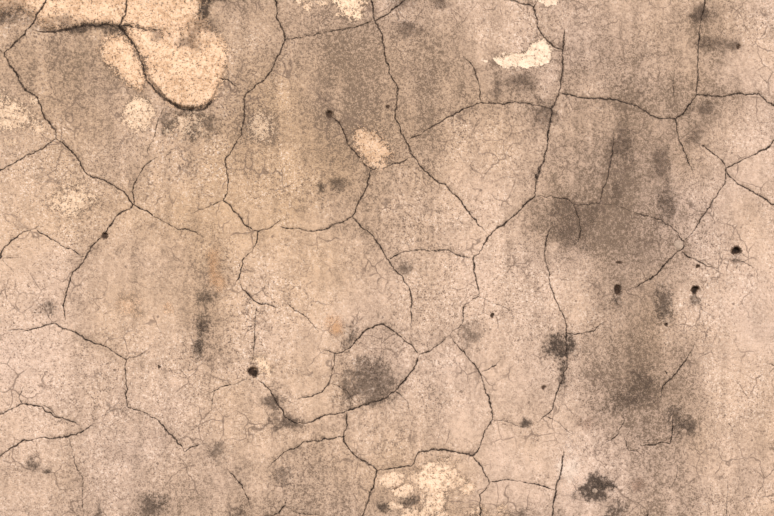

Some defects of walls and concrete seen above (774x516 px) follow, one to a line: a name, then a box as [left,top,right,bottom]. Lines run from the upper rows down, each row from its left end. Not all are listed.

peeling [0,0,208,132]
peeling [481,36,553,69]
peeling [163,104,208,142]
peeling [353,127,392,169]
crack [0,0,213,456]
crack [212,0,774,516]
damp [542,333,576,384]
peeling [377,457,476,516]
damp [557,444,625,516]